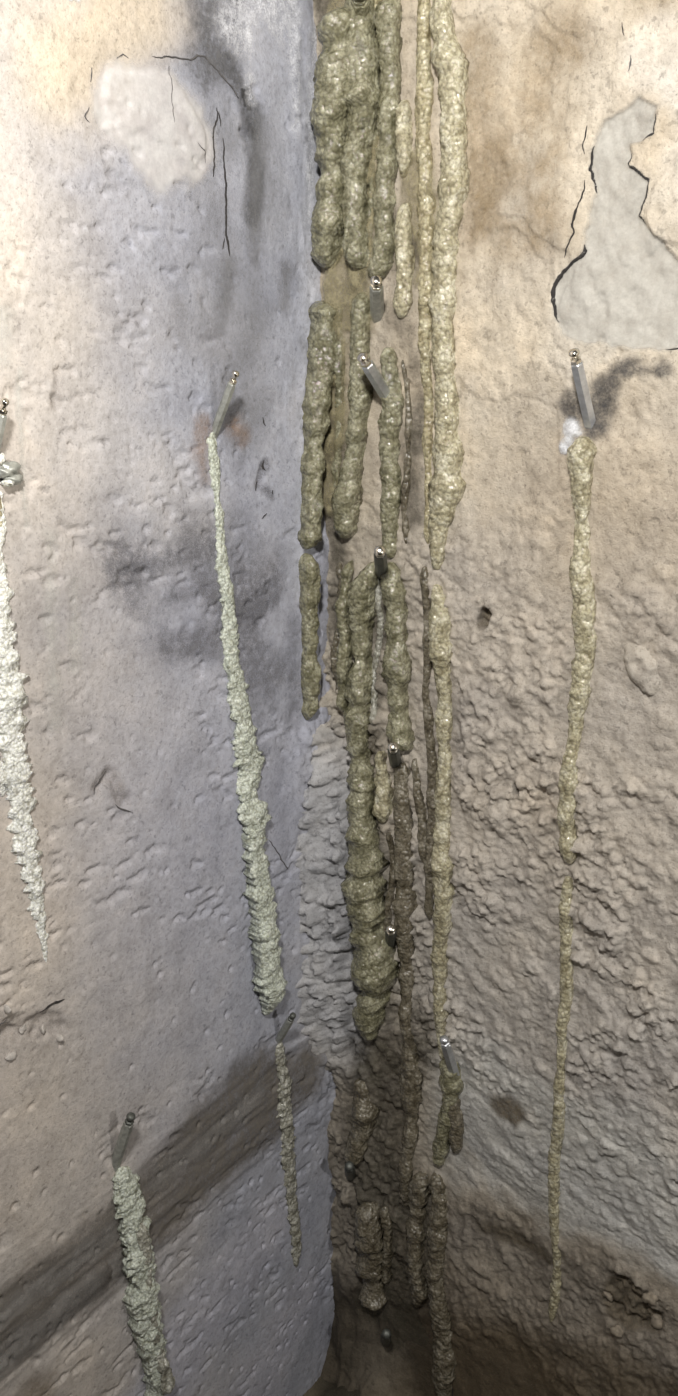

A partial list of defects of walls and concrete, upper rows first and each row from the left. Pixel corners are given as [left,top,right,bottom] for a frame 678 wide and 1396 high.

crack [84,54,239,256]
flaking render [551,98,678,350]
damp [200,558,295,693]